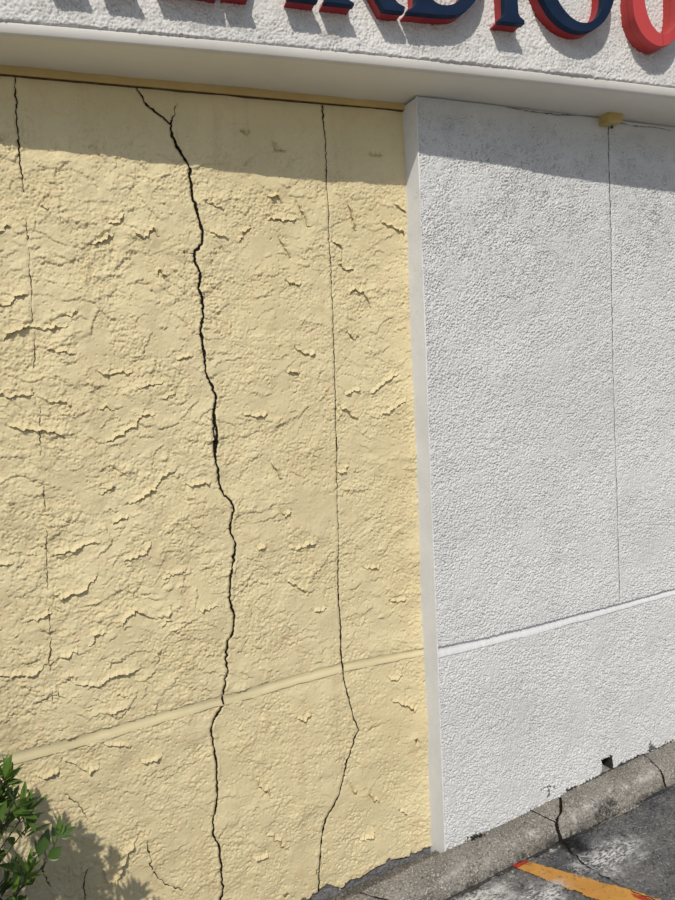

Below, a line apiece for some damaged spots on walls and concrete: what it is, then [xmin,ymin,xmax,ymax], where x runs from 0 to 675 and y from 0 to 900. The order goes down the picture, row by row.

crack [321,105,338,487]
crack [136,88,236,900]
crack [316,509,380,892]
crack [531,797,655,900]
spalling [541,739,673,798]